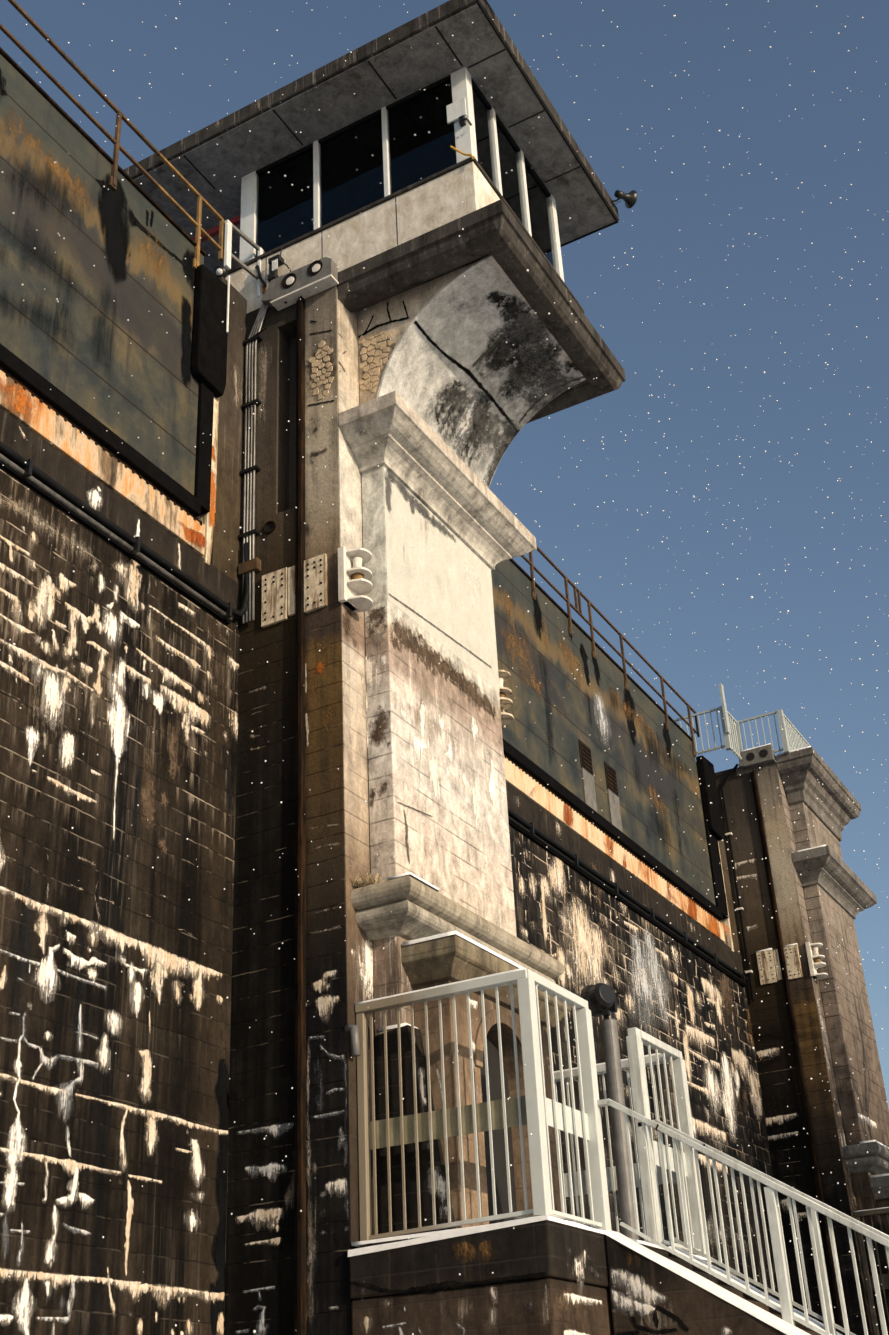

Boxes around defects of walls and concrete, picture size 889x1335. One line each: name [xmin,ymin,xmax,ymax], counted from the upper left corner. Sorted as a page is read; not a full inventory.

corrosion [0,377,35,422]
crack [307,301,585,433]
corrosion [181,446,216,548]
leakage [0,560,211,853]
leakage [224,710,238,806]
leakage [343,604,496,826]
corrosion [563,803,573,826]
leakage [100,1012,121,1068]
leakage [0,874,223,1035]
leakage [519,857,798,1142]
corrosion [667,883,730,937]
leakage [0,1042,290,1335]